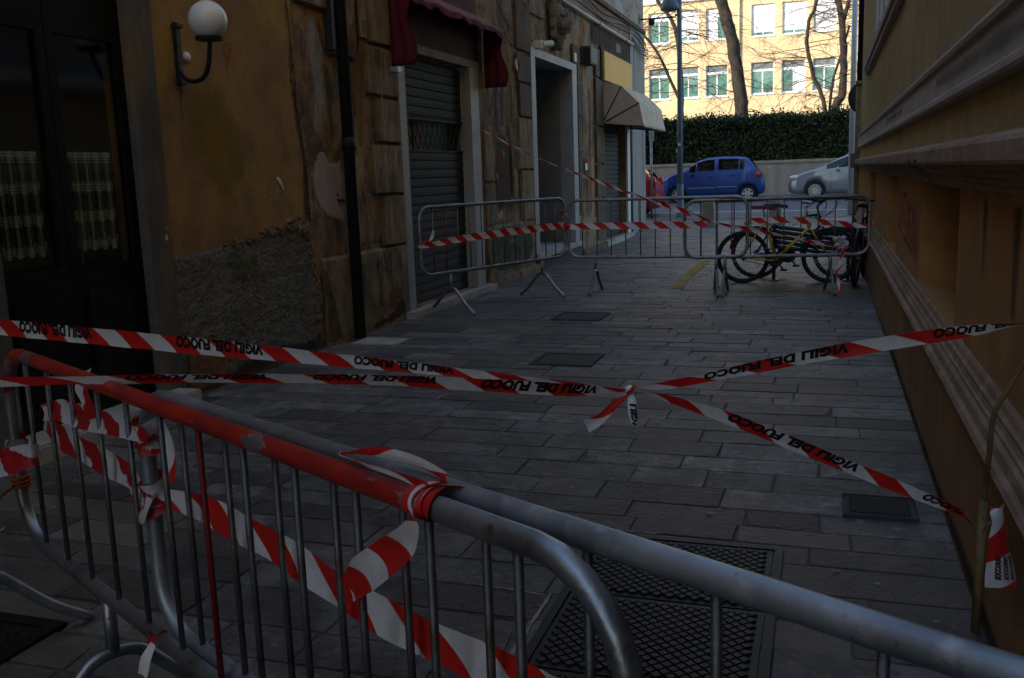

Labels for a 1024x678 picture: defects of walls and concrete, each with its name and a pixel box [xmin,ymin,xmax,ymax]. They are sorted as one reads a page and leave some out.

peeling [313,152,344,220]